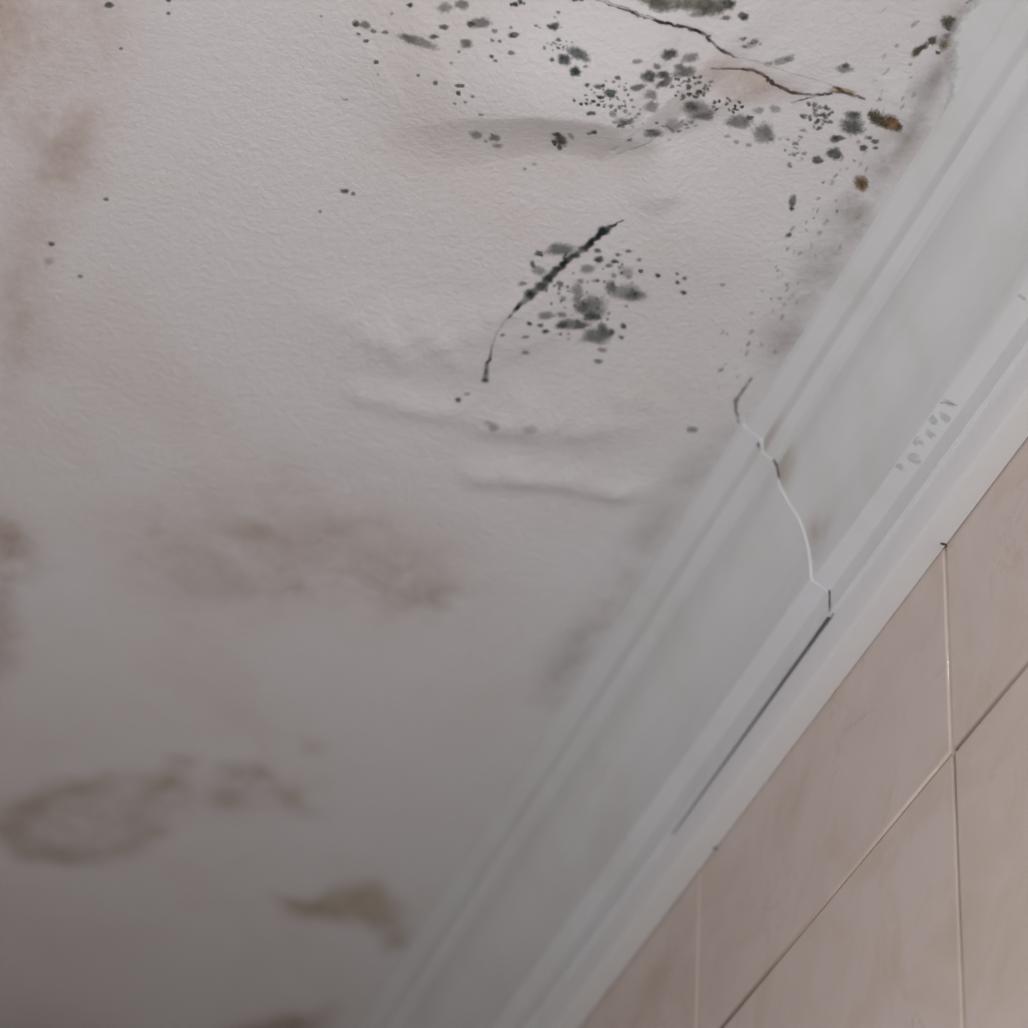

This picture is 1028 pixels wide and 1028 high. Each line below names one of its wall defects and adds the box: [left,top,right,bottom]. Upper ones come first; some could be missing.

damp [467,19,489,27]
damp [642,0,749,20]
damp [942,18,956,31]
crack [598,0,865,101]
damp [912,37,940,56]
damp [547,11,771,141]
damp [552,133,566,150]
damp [800,103,878,163]
damp [530,245,571,268]
crack [508,220,623,318]
damp [523,299,626,343]
crack [482,353,492,382]